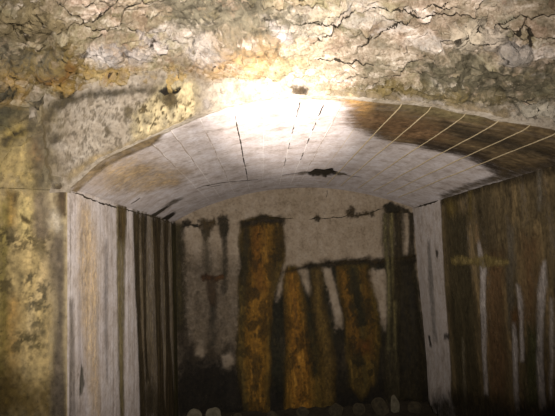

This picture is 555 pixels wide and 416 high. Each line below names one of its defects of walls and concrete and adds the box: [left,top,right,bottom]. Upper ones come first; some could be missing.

crack [288,21,338,41]
crack [315,2,457,68]
crack [485,14,534,60]
leakage [0,49,126,416]
crack [199,116,258,188]
crack [300,102,344,165]
spalling [286,168,358,177]
leakage [288,86,555,416]
leakage [133,211,244,416]
leakage [268,287,287,411]
rust [236,215,334,413]
rust [336,264,381,398]